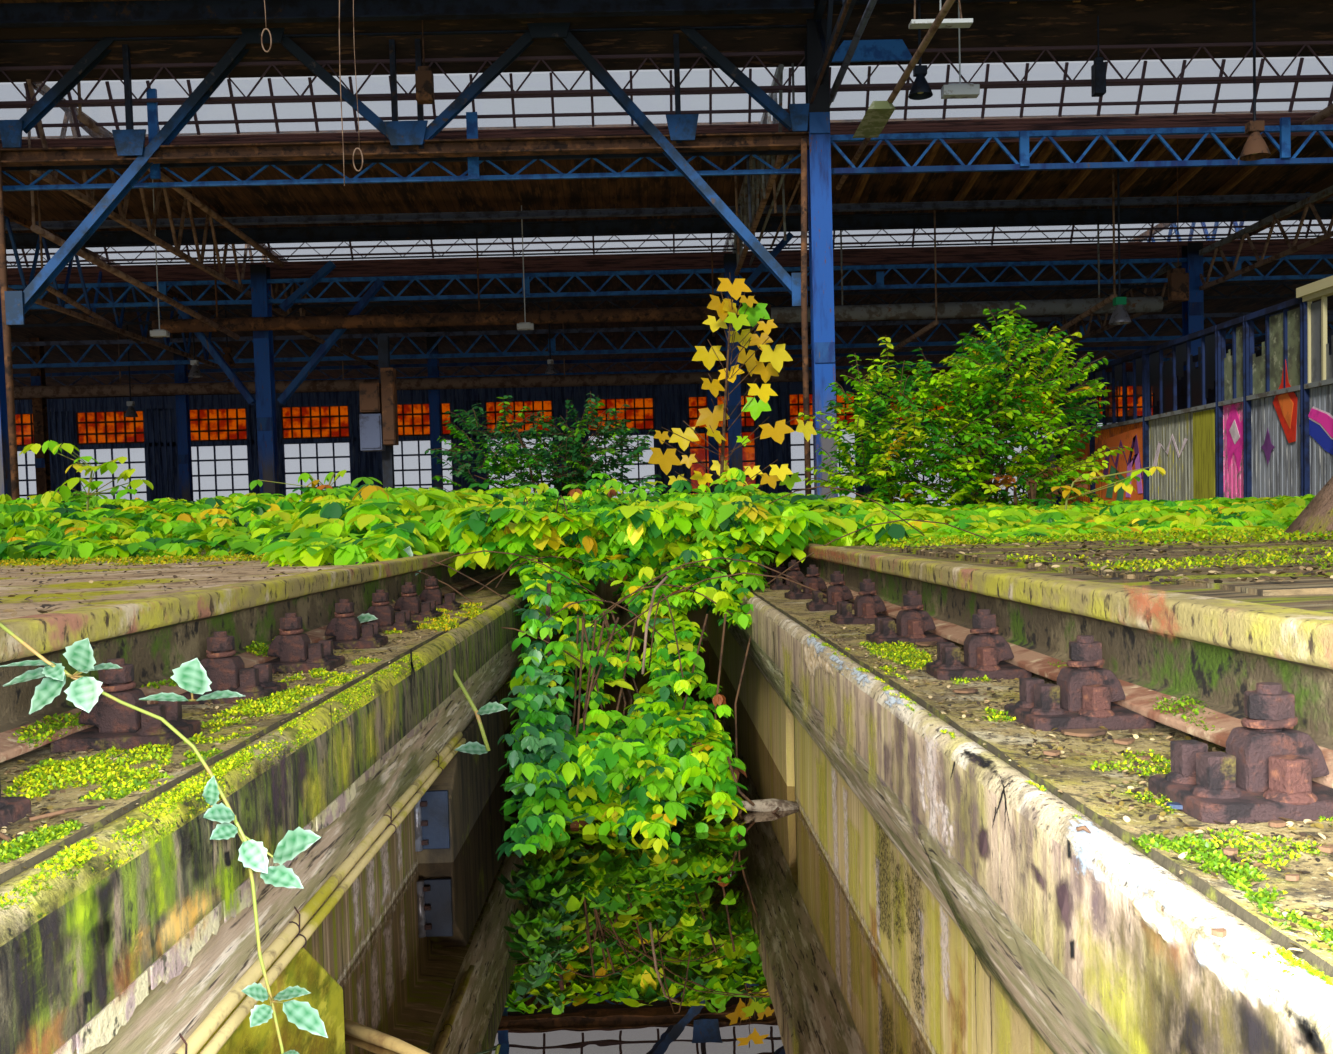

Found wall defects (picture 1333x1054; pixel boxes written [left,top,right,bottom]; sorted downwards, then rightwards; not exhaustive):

crack [992,776,1012,828]
water stain [0,862,117,1054]
water stain [226,1019,337,1054]
water stain [796,765,949,1054]
water stain [1033,858,1102,928]
water stain [1107,925,1295,1054]